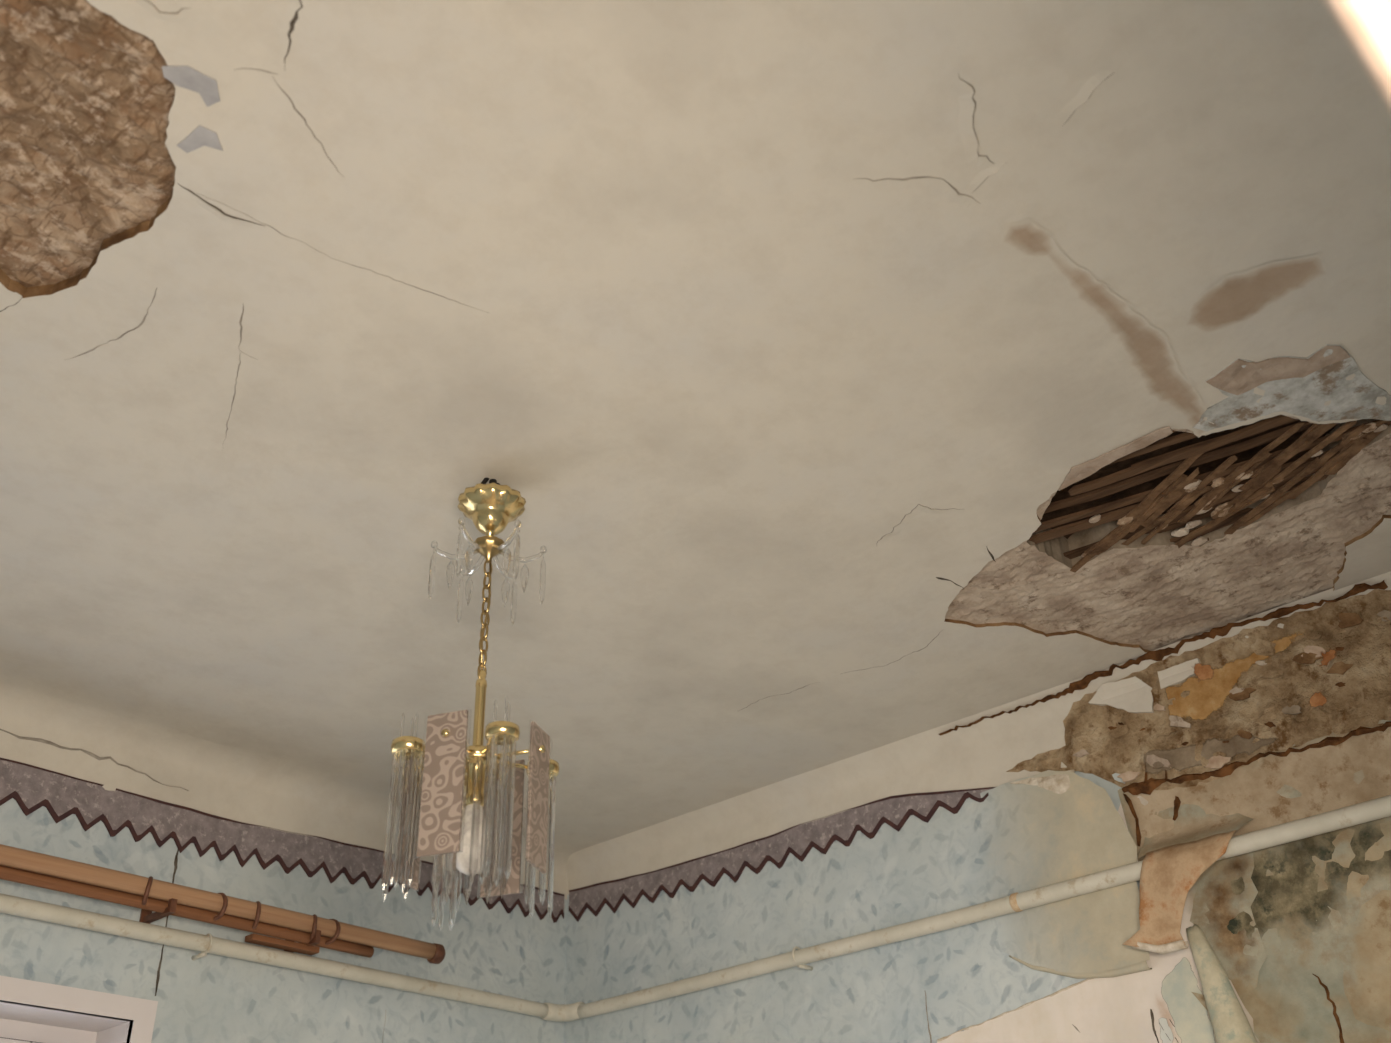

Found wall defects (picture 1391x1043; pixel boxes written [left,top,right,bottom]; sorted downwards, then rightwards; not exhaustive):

crack [236,0,340,174]
spalling [0,191,173,298]
crack [65,288,157,360]
crack [222,303,258,450]
water stain [1001,218,1214,438]
water stain [1185,253,1330,334]
peeling [1027,344,1391,568]
crack [0,728,189,791]
peeling [1088,658,1201,746]
flaking render [1117,705,1391,862]
peeling [937,929,1216,1043]
water stain [1181,819,1391,1043]